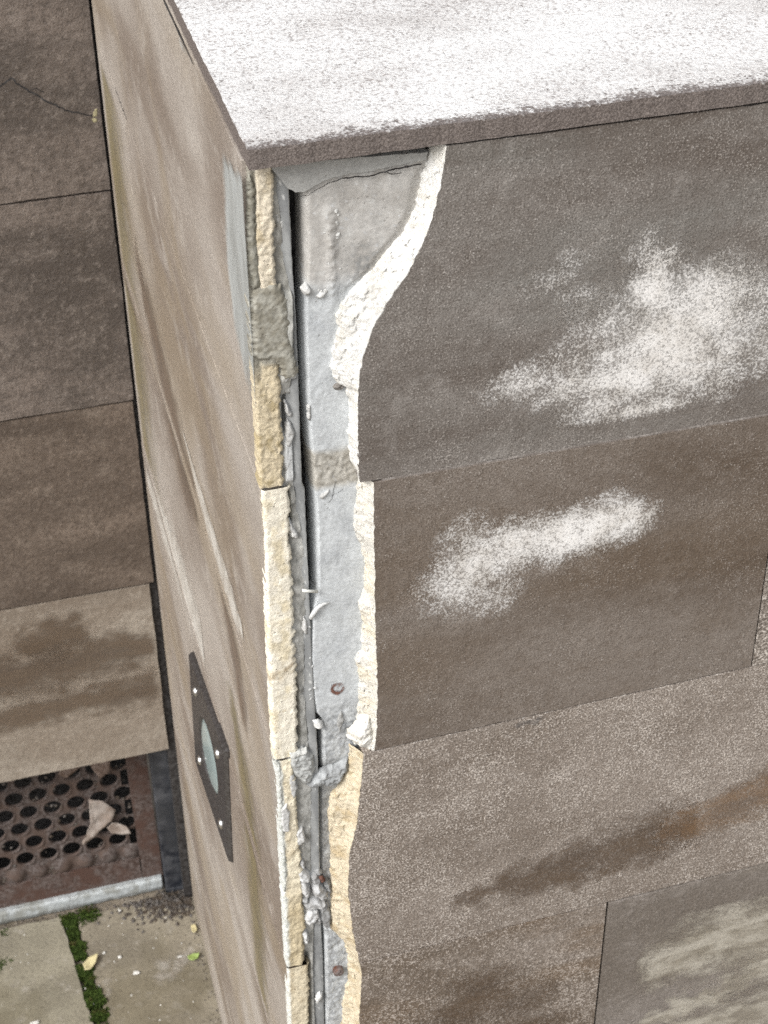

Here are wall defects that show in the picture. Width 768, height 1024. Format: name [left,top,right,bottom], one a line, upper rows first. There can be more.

crack [0,78,93,117]
damp [490,231,768,425]
spalling [244,144,447,1024]
damp [416,492,661,616]